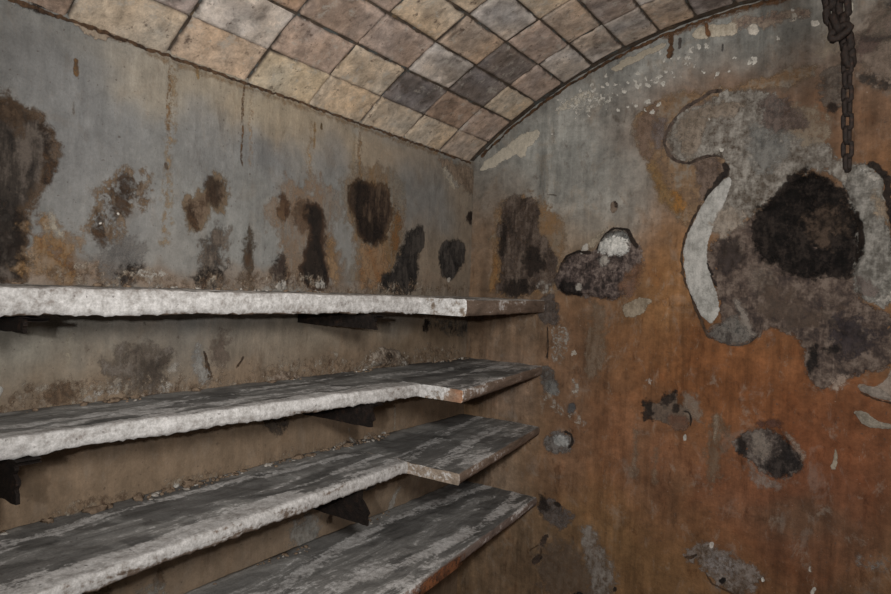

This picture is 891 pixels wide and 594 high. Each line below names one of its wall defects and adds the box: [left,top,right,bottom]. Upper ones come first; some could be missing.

damp [0,90,63,284]
damp [182,171,233,290]
damp [270,192,329,291]
damp [347,177,393,247]
damp [380,225,425,295]
peeling [438,129,540,195]
damp [489,191,567,326]
flaking render [666,88,891,404]
flaking render [642,390,703,441]
flaking render [731,419,805,488]
peeling [854,411,891,429]
flaking render [683,542,764,594]